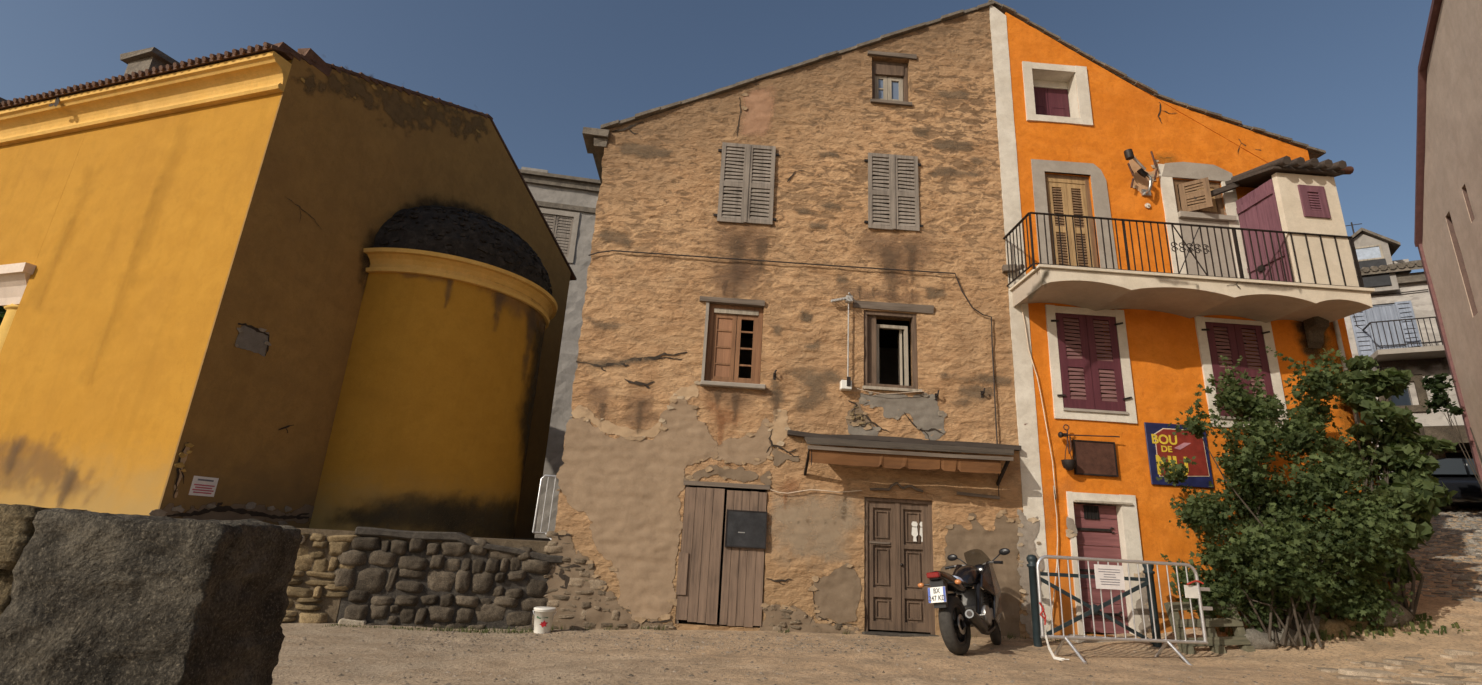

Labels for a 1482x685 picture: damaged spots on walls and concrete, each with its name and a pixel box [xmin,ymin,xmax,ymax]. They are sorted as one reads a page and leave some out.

leakage [337,308,545,539]
crack [576,352,687,388]
peeling [543,381,800,630]
spalling [845,392,947,440]